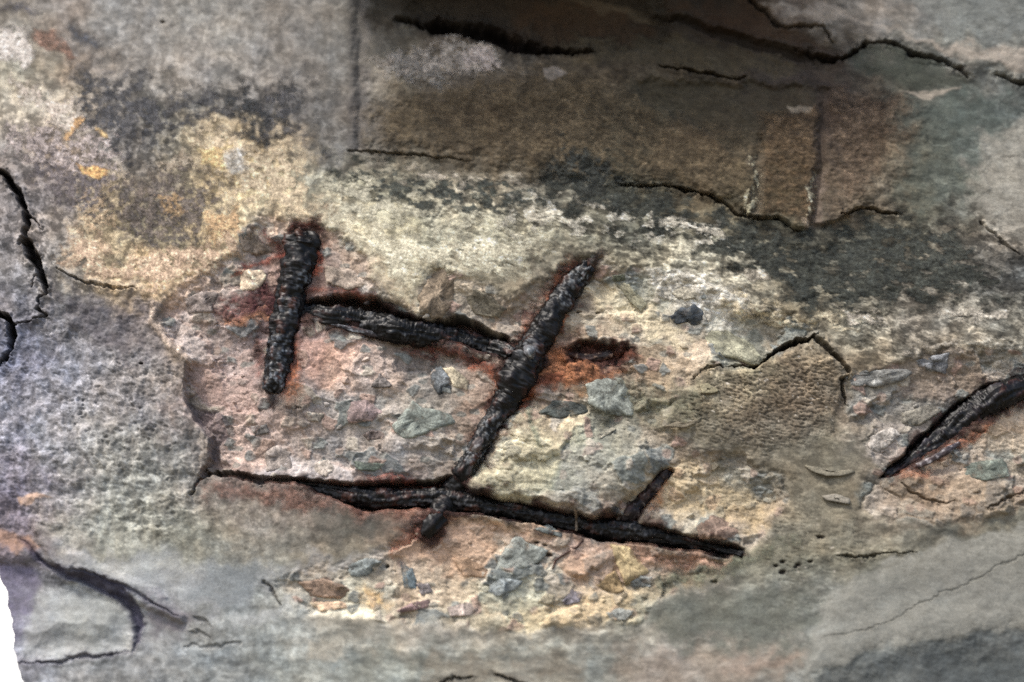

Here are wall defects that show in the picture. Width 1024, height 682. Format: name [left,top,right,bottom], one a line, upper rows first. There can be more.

crack [392,14,595,57]
crack [651,0,1024,87]
crack [620,182,802,233]
crack [0,168,139,367]
rust [215,284,275,358]
rust [257,287,423,415]
rust [519,297,641,408]
crack [691,332,852,405]
spalling [157,216,820,634]
rust [214,472,480,548]
rust [355,473,506,501]
crack [17,538,242,666]